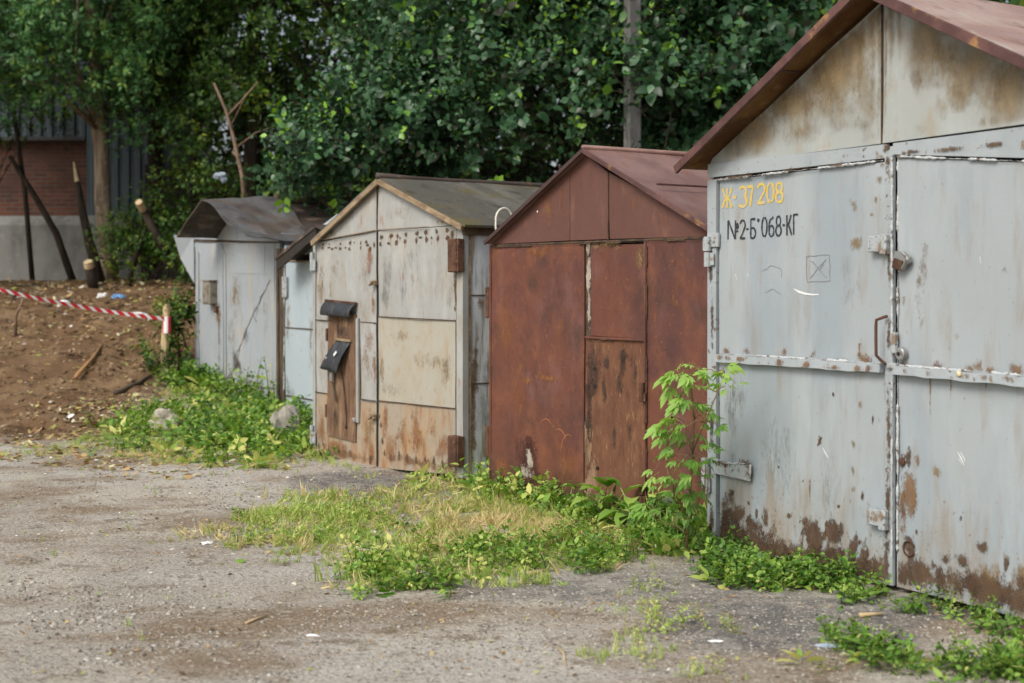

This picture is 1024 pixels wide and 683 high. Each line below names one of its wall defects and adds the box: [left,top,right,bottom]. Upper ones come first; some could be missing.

rust [321,220,454,282]
rust [710,298,749,361]
rust [317,409,451,472]
peeling [520,449,534,479]
rust [872,391,911,467]
rust [709,474,1024,614]